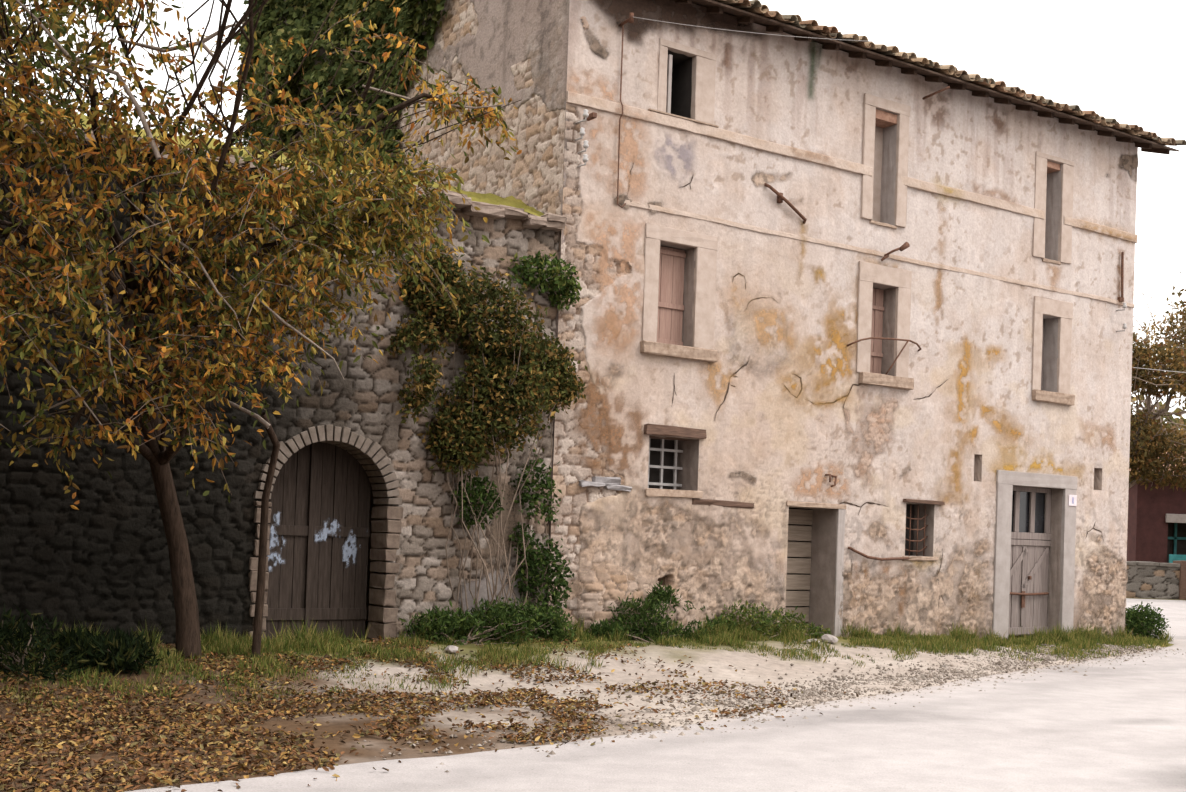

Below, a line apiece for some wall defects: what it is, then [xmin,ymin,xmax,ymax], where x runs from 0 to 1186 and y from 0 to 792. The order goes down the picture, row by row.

crack [732,273,778,312]
flaking render [394,0,632,633]
leakage [755,309,792,344]
leakage [707,363,729,401]
crack [714,359,749,421]
crack [784,374,868,418]
leakage [969,405,1021,441]
spalling [869,521,887,539]
spalling [838,539,991,640]
flaking render [1079,535,1128,638]